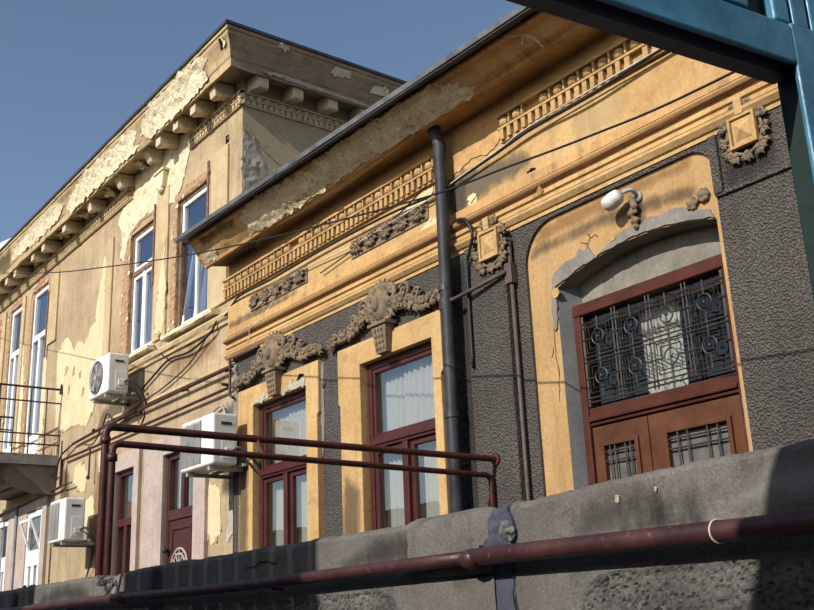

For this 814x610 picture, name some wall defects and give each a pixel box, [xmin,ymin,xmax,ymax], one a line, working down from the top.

flaking render [11,56,208,262]
flaking render [260,70,371,107]
flaking render [239,82,485,236]
peeling [55,255,107,433]
flaking render [114,133,211,354]
flaking render [202,248,218,264]
peeling [551,207,716,332]
flaking render [207,466,233,546]